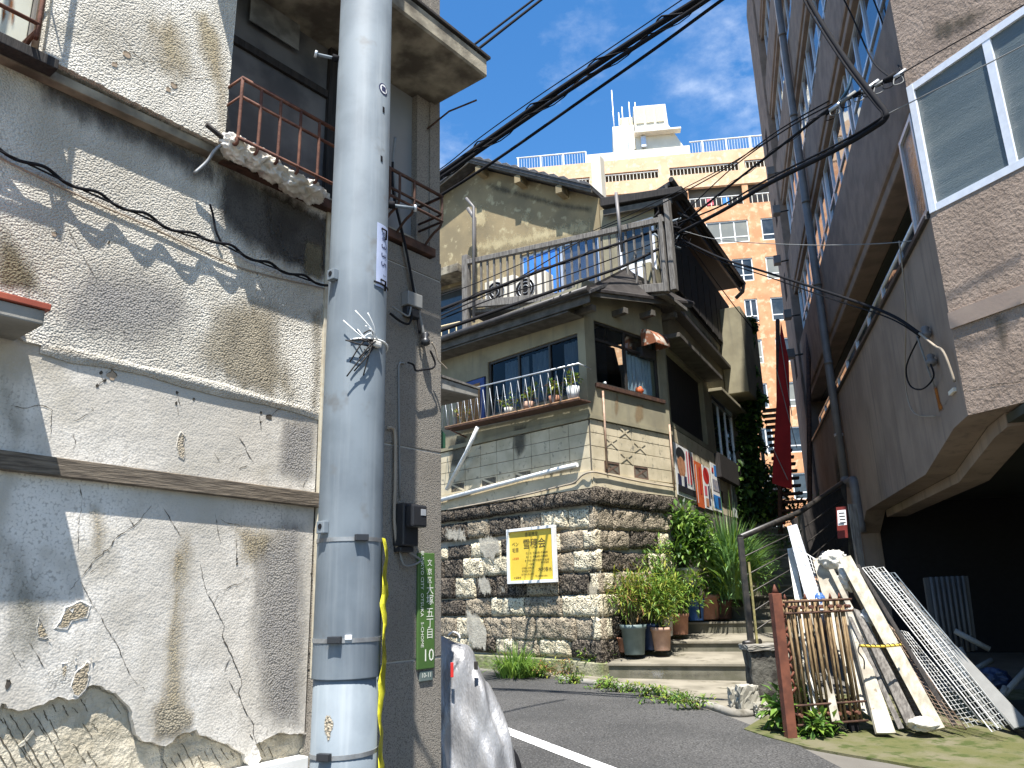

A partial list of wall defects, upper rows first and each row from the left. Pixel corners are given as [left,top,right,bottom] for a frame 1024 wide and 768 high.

damp [199,16,221,83]
damp [41,82,326,278]
peeling [176,431,186,461]
peeling [36,600,92,640]
spalling [0,655,241,768]
crack [70,489,181,690]
damp [157,645,192,734]
crack [200,564,256,741]
damp [243,528,299,720]
spalling [256,735,304,763]